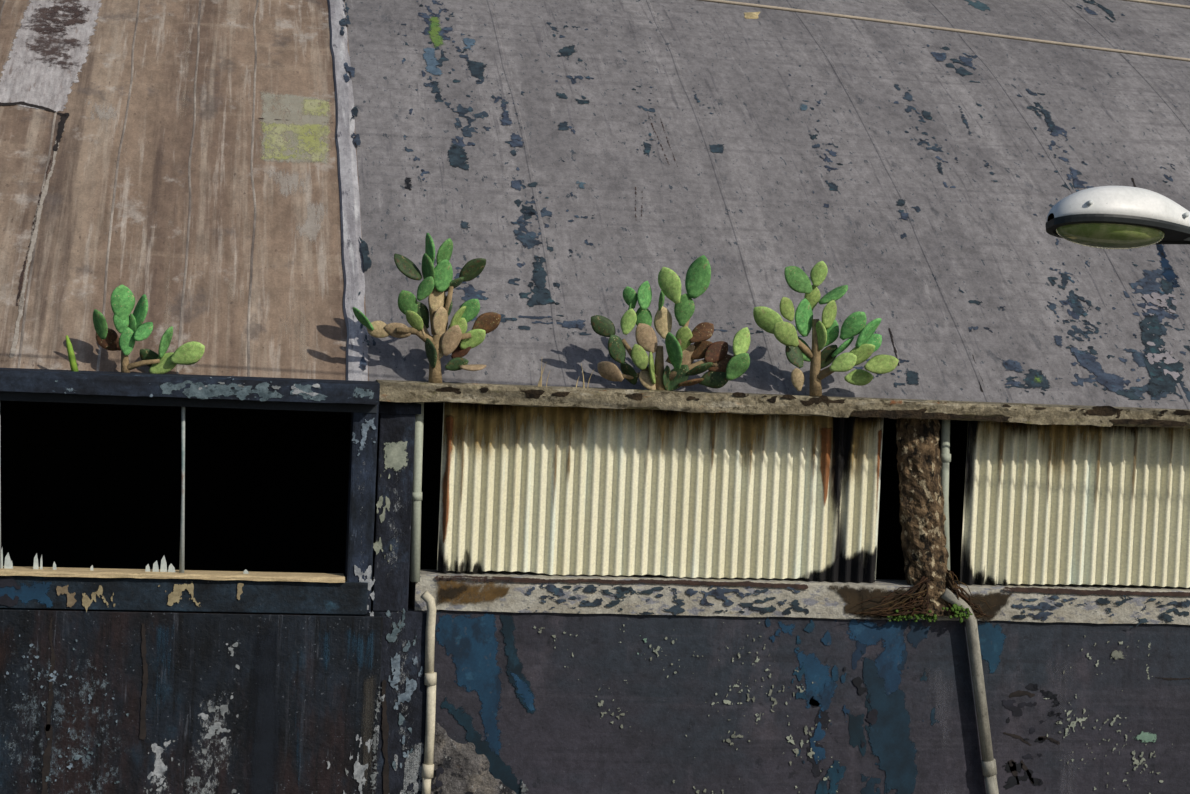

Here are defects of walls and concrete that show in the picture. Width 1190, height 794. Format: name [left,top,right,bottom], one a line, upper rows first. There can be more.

peeling [398,0,594,335]
peeling [1017,85,1093,207]
crack [9,124,65,358]
crack [1156,244,1180,287]
peeling [1002,255,1190,401]
peeling [352,418,408,479]
rust [442,402,833,542]
rust [849,417,883,501]
spalling [1109,419,1187,427]
peeling [158,583,200,607]
peeling [144,693,239,794]
peeling [526,584,940,794]